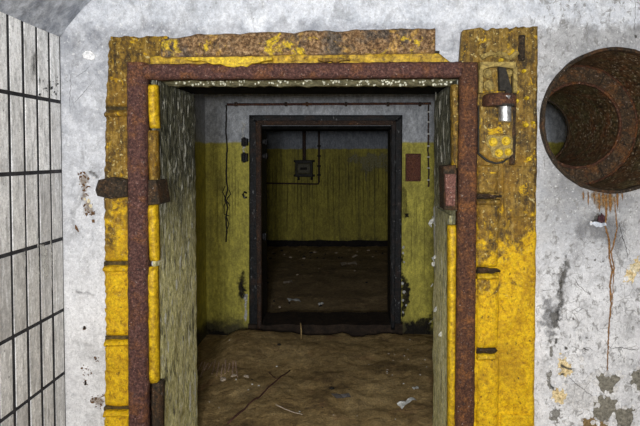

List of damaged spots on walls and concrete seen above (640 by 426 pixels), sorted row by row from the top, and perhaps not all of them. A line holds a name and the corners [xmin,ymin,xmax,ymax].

rust [78,172,95,223]
damp [404,314,433,335]
damp [542,255,570,357]
rust [582,192,623,371]